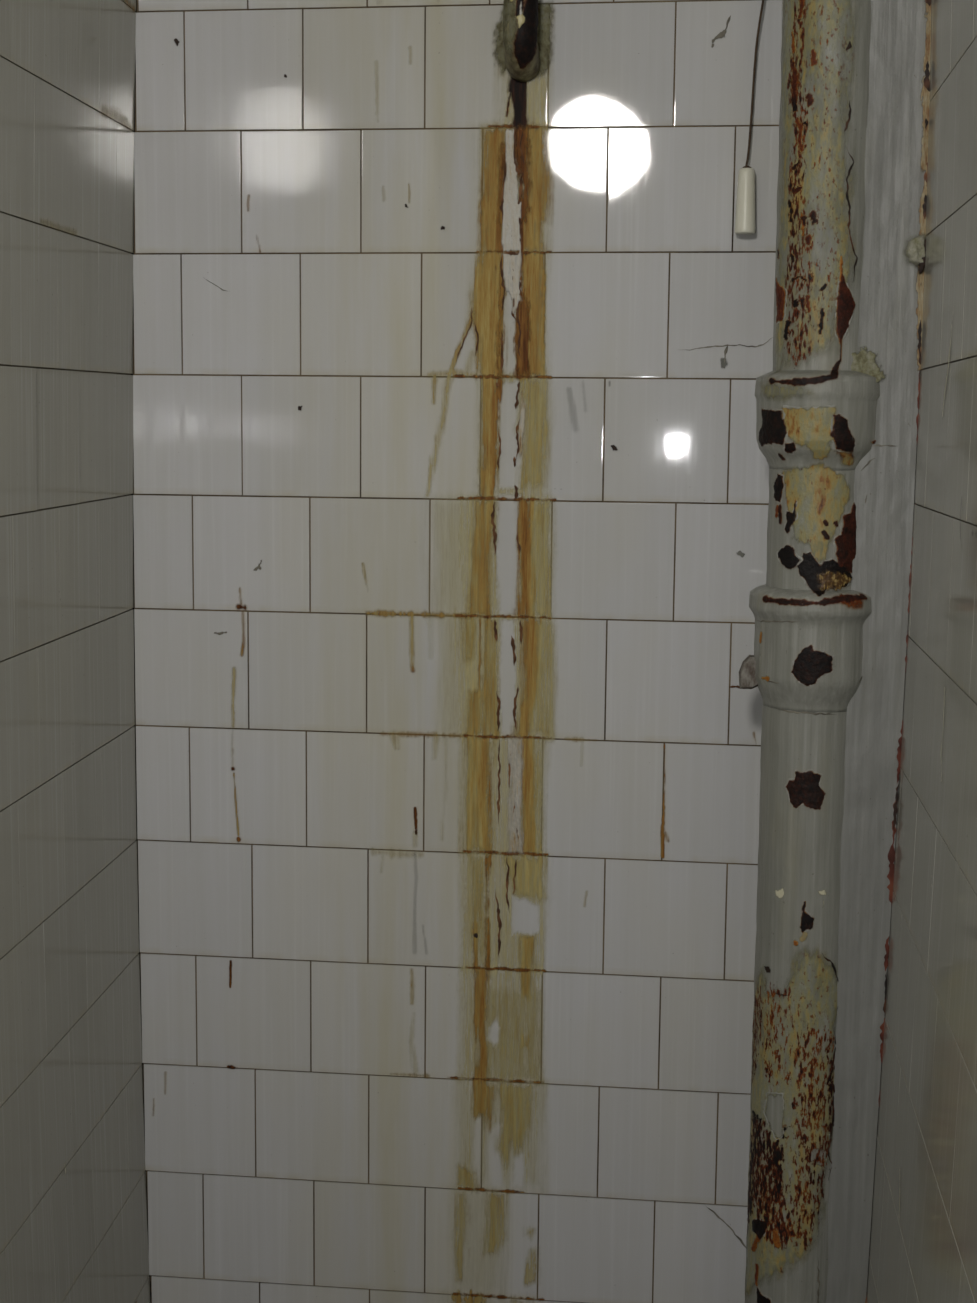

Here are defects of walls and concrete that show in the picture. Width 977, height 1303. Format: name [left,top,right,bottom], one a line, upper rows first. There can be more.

peeling [758,0,876,597]
corrosion [366,0,556,1162]
corrosion [232,589,246,720]
spalling [791,644,834,686]
corrosion [231,767,241,842]
spalling [784,769,825,810]
corrosion [452,1144,544,1303]